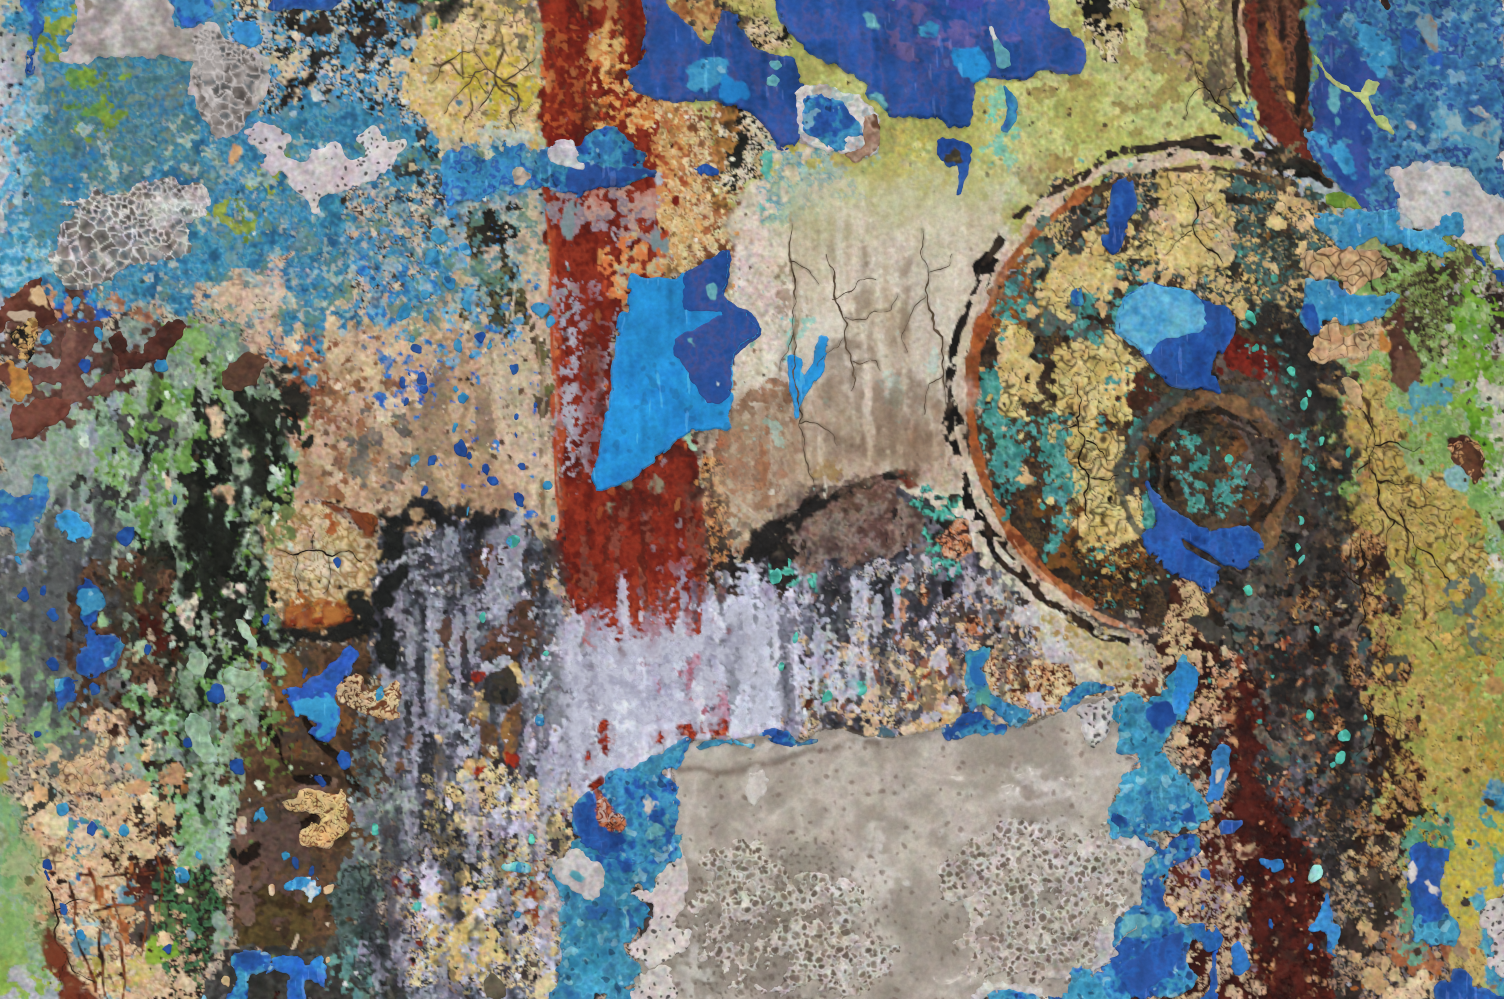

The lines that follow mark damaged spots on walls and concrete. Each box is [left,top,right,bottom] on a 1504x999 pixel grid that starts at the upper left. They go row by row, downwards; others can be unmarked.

crack [1166,191,1223,263]
peeling [1299,0,1504,409]
crack [780,231,952,487]
crack [1061,385,1118,519]
water stain [749,489,853,562]
water stain [560,603,782,778]
water stain [371,816,402,962]
water stain [424,743,453,793]
water stain [430,813,481,943]
spalling [501,646,1251,999]
corrosion [1208,683,1326,999]